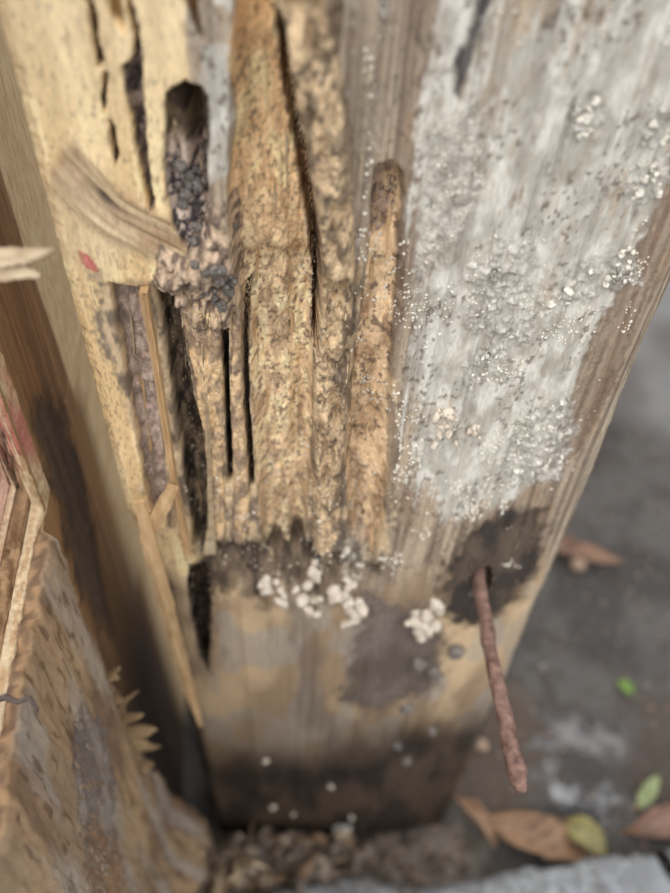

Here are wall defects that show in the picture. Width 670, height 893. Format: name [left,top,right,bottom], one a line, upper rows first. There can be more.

crack [89,0,124,160]
peeling [357,29,387,199]
water stain [338,592,446,708]
water stain [188,703,492,835]